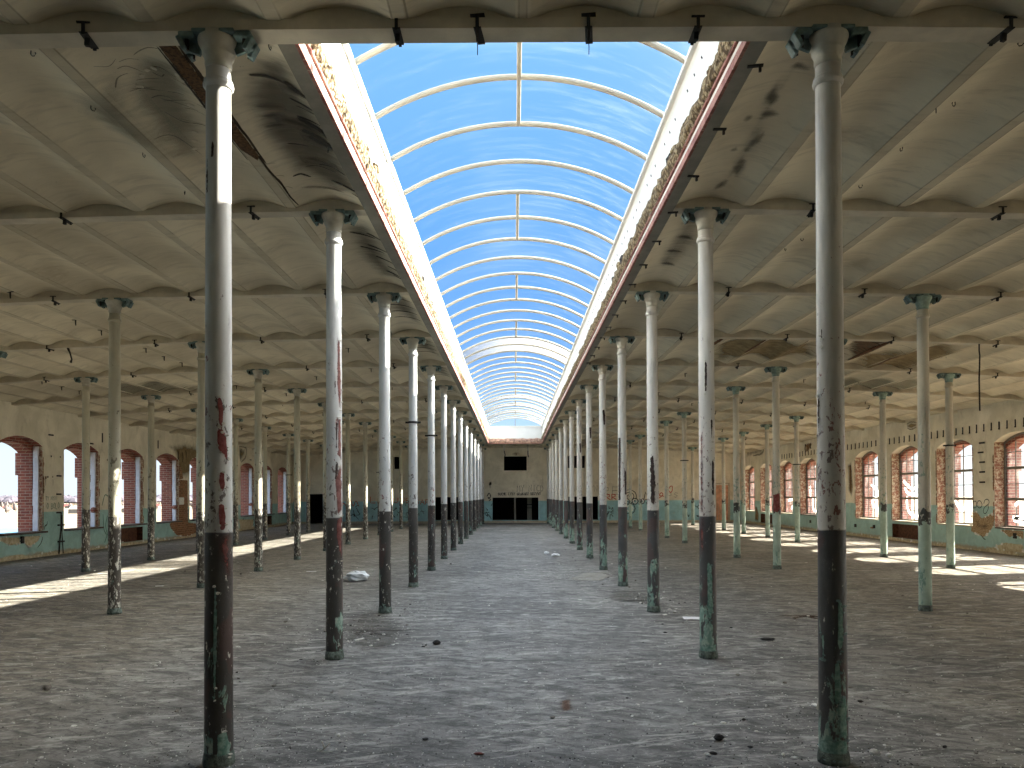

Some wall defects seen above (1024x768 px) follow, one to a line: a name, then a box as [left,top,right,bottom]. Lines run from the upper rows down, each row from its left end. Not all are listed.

water stain [249,65,357,197]
peeling [335,340,344,562]
peeling [700,417,715,510]
spalling [746,488,817,531]
spalling [846,456,918,544]
spalling [932,447,1024,556]
peeling [212,585,220,702]
peeling [217,730,233,758]
peeling [838,696,850,742]